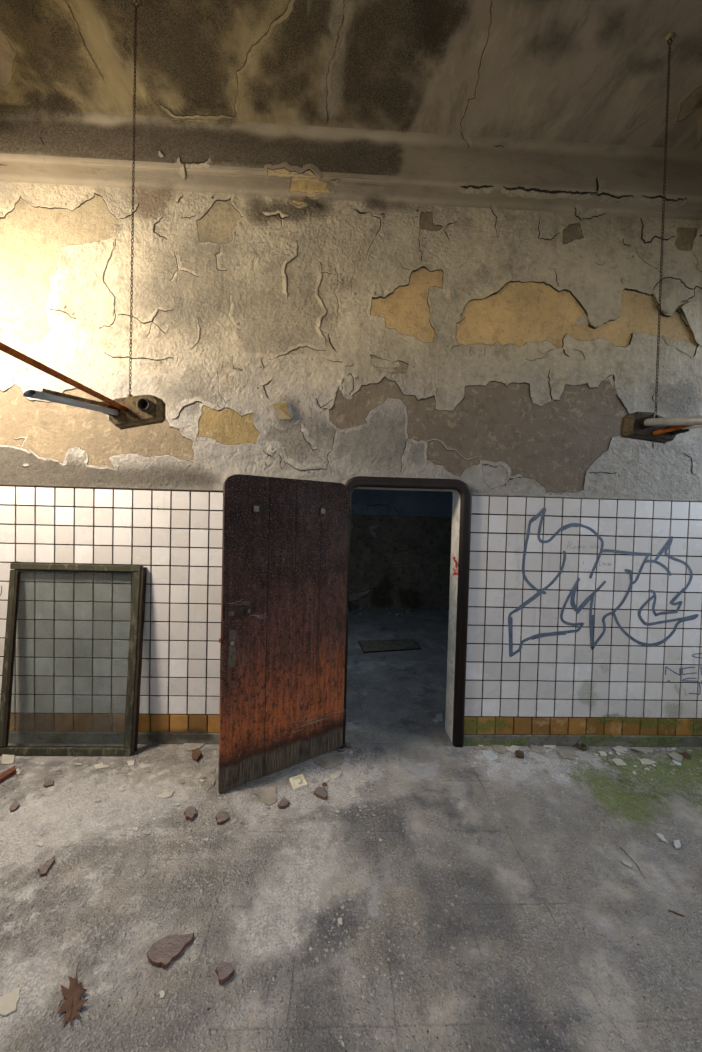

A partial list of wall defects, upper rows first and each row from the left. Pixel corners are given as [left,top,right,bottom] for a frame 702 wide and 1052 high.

damp [0,0,400,179]
damp [250,0,466,130]
peeling [0,185,124,347]
peeling [192,192,249,248]
peeling [415,206,449,236]
peeling [366,261,702,362]
crack [458,178,702,246]
crack [621,270,702,302]
peeling [670,222,702,256]
peeling [0,380,267,472]
peeling [326,347,632,496]